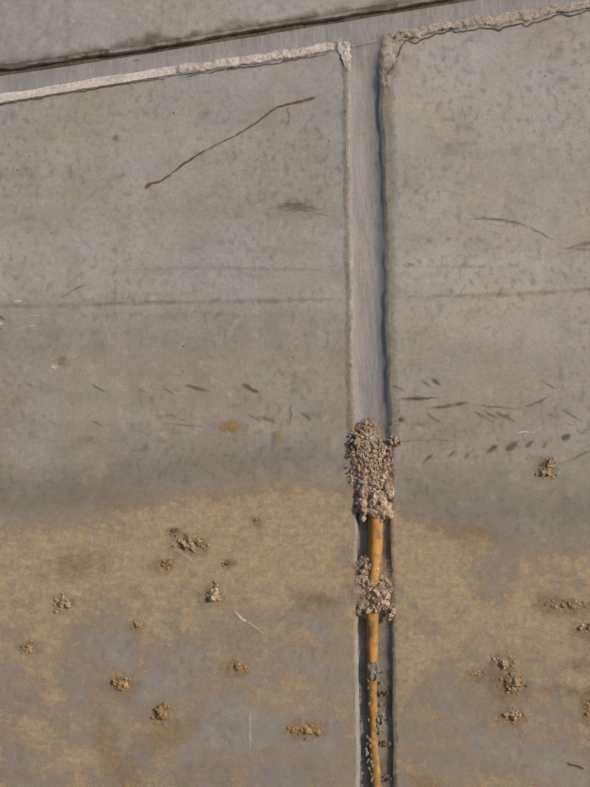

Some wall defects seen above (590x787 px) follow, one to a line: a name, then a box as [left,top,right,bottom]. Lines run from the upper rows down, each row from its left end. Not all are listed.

rust [145,97,315,188]